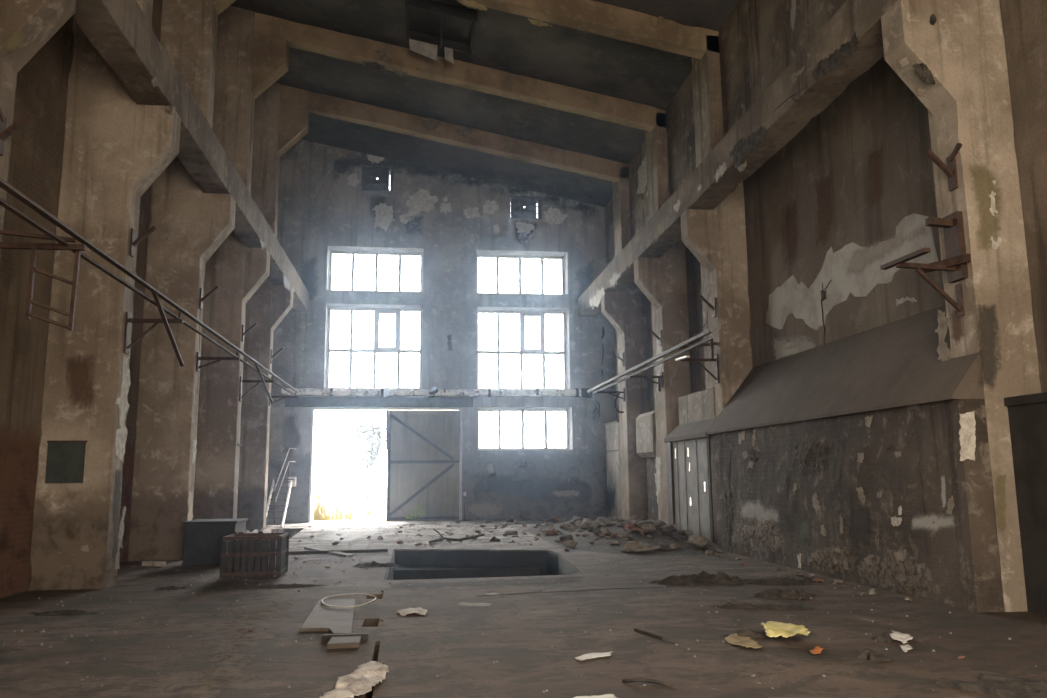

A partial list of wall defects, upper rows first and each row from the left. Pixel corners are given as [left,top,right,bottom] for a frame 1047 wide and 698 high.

flaking render [766,213,938,330]
water stain [741,501,778,521]
water stain [912,476,954,530]